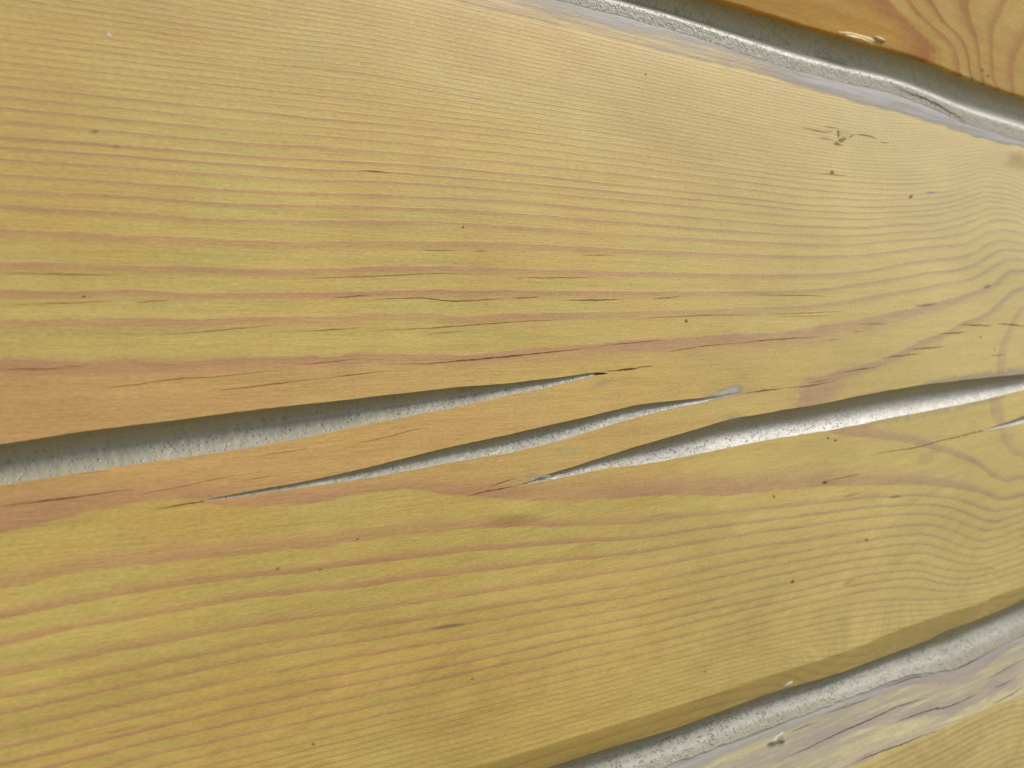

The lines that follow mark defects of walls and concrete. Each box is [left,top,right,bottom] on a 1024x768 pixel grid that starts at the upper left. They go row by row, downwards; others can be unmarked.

crack [308,250,612,334]
crack [0,295,1024,509]